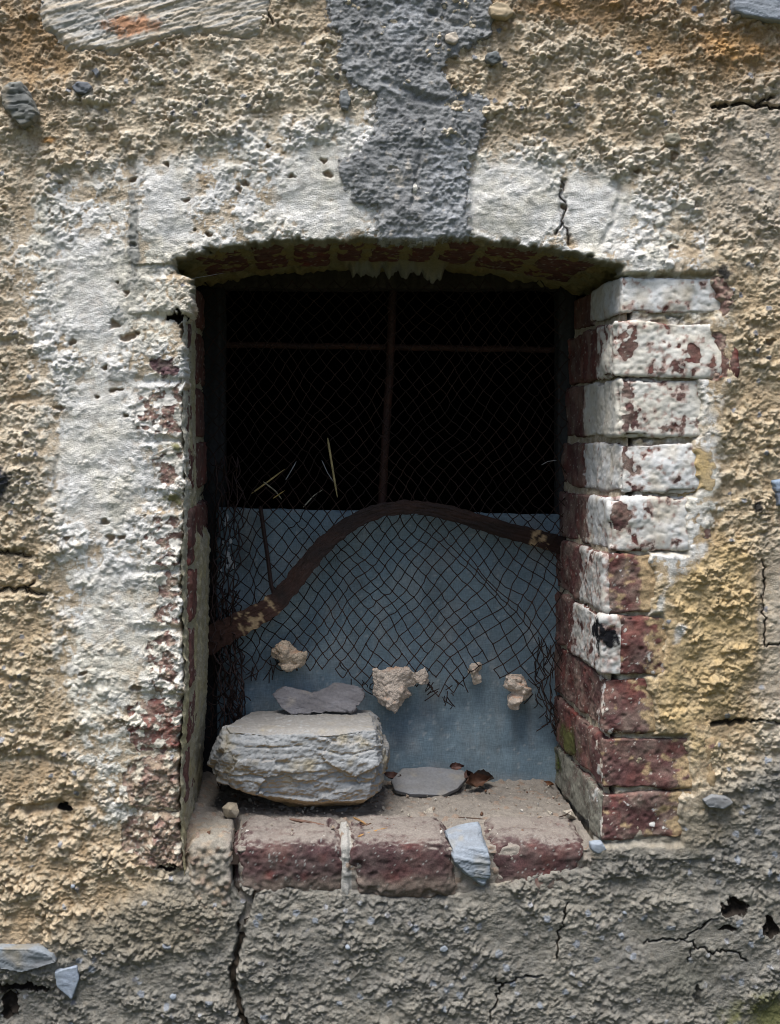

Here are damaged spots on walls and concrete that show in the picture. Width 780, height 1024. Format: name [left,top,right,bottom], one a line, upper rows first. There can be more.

crack [711,96,780,110]
spalling [132,357,185,439]
spalling [149,450,188,493]
peeling [563,276,734,836]
crack [761,560,780,647]
crack [712,717,780,725]
crack [230,831,261,1024]
crack [644,918,746,960]
crack [490,975,539,1020]